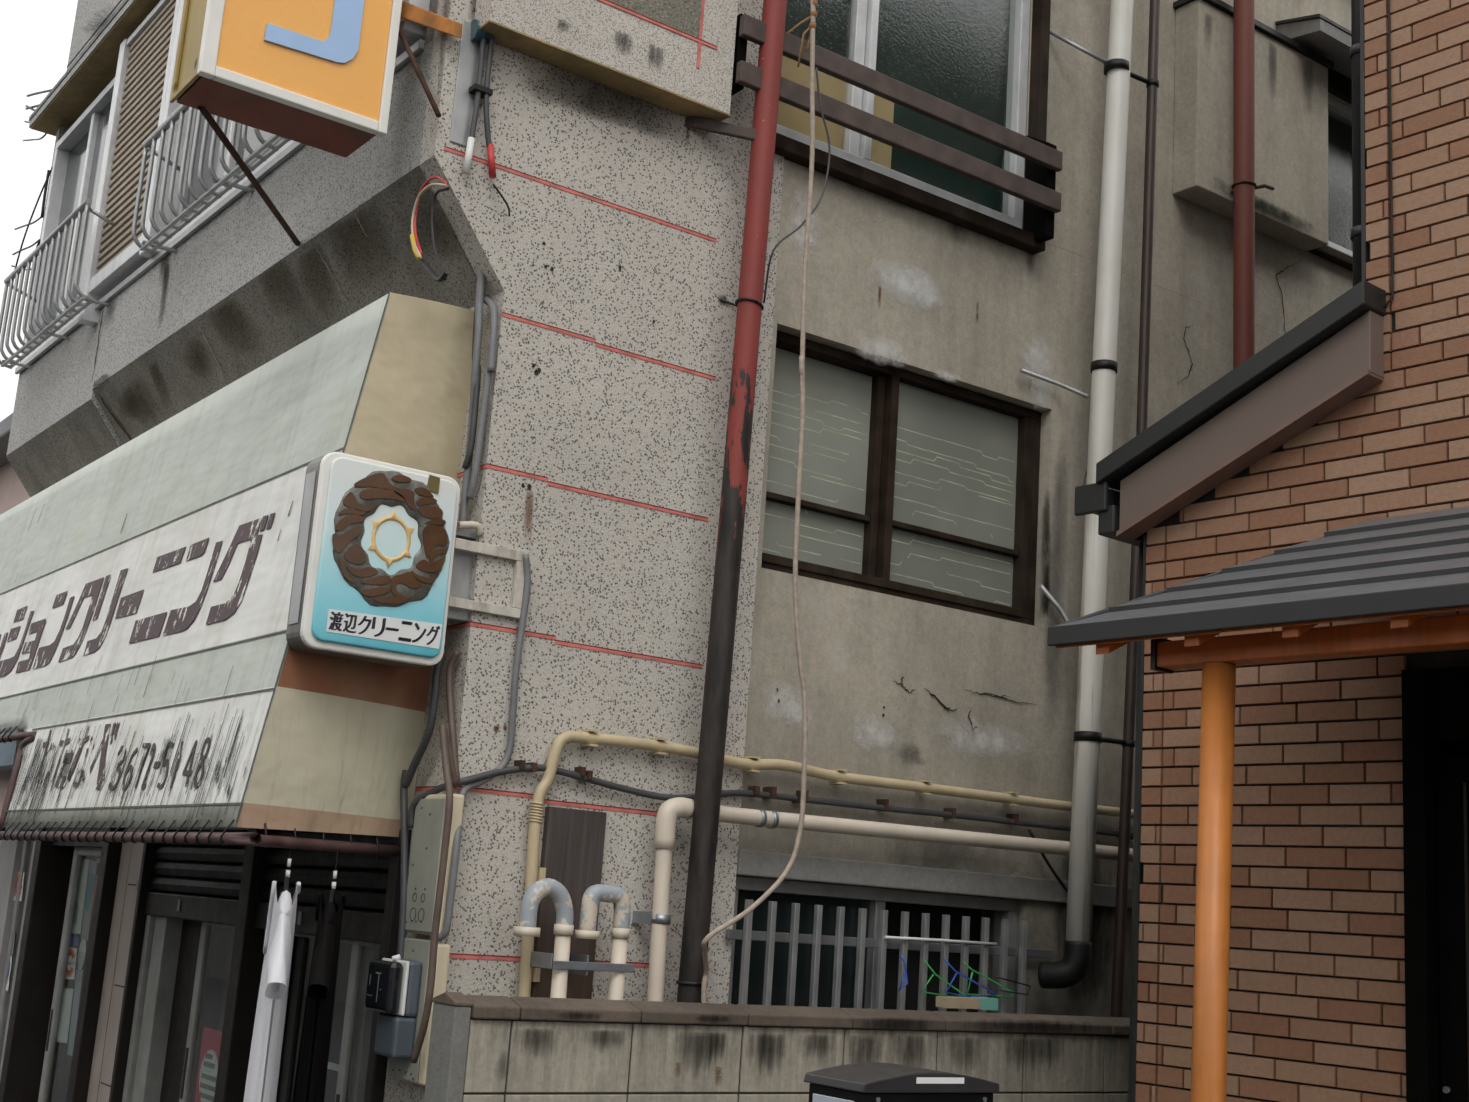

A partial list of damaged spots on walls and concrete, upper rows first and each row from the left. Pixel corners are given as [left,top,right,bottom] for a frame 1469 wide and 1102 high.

crack [1276,259,1303,333]
crack [895,677,1037,729]
leakage [562,1012,614,1044]
leakage [690,1016,727,1058]
leakage [760,1035,781,1064]
leakage [853,1018,924,1063]
leakage [958,1021,1086,1061]